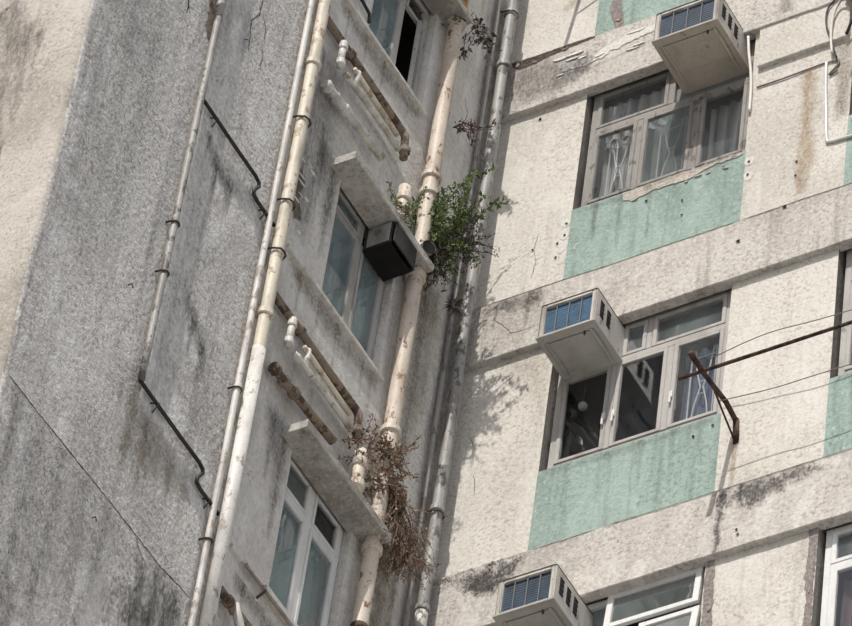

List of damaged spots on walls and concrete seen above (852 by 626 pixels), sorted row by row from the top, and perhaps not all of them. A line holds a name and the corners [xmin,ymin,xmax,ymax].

peeling [511,23,655,77]
peeling [623,152,743,201]
leakage [713,465,817,552]
leakage [442,557,521,595]